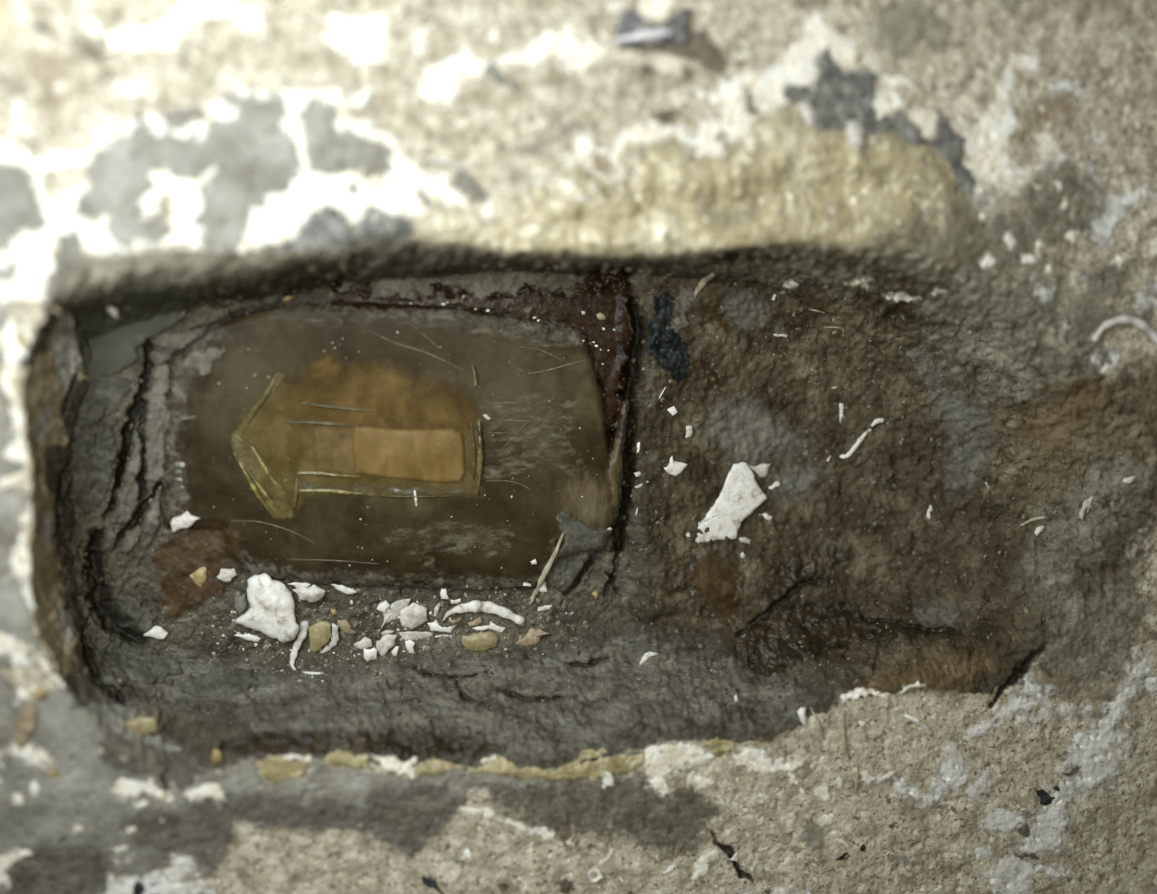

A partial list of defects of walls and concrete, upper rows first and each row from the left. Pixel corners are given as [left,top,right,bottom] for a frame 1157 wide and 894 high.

water stain [44,92,395,303]
water stain [279,204,416,255]
peeling [323,12,614,108]
peeling [564,10,938,187]
crack [80,288,297,704]
spalling [0,84,1157,798]
crack [564,305,645,596]
water stain [917,160,1157,700]
water stain [0,386,646,894]
crack [736,579,823,636]
crack [988,647,1045,708]
peeling [111,777,173,803]